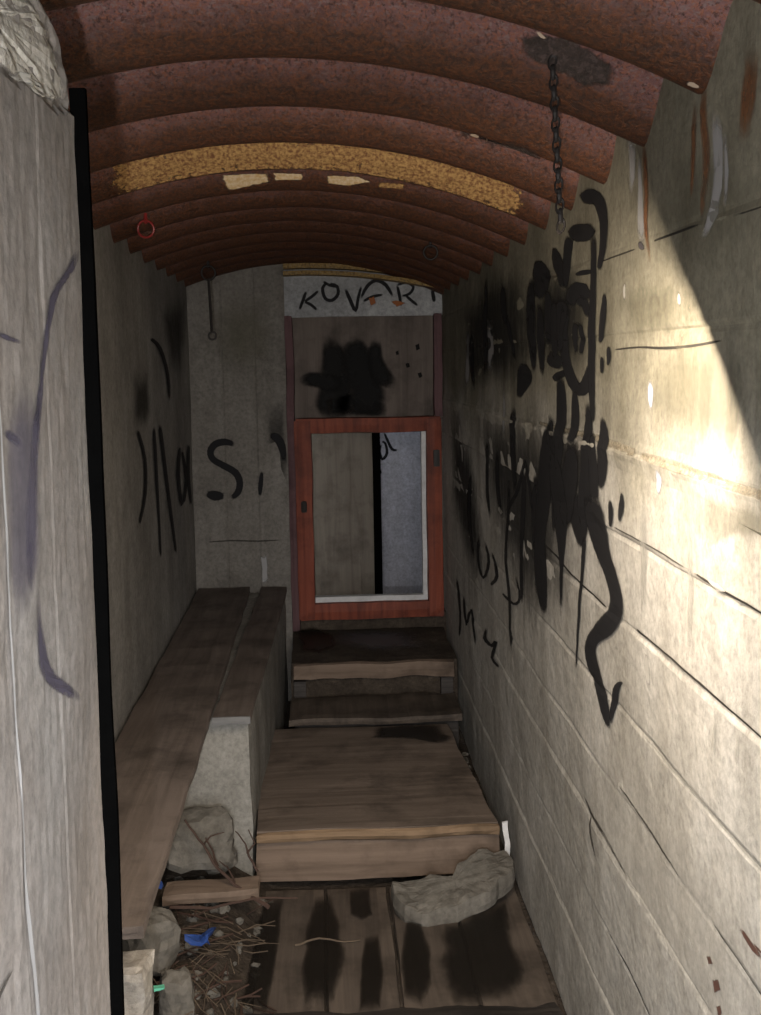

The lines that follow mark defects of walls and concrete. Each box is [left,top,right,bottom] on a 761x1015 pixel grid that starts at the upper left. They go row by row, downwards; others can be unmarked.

spalling [0,0,61,99]
rust [740,66,757,130]
rust [630,147,648,250]
rust [691,97,728,232]